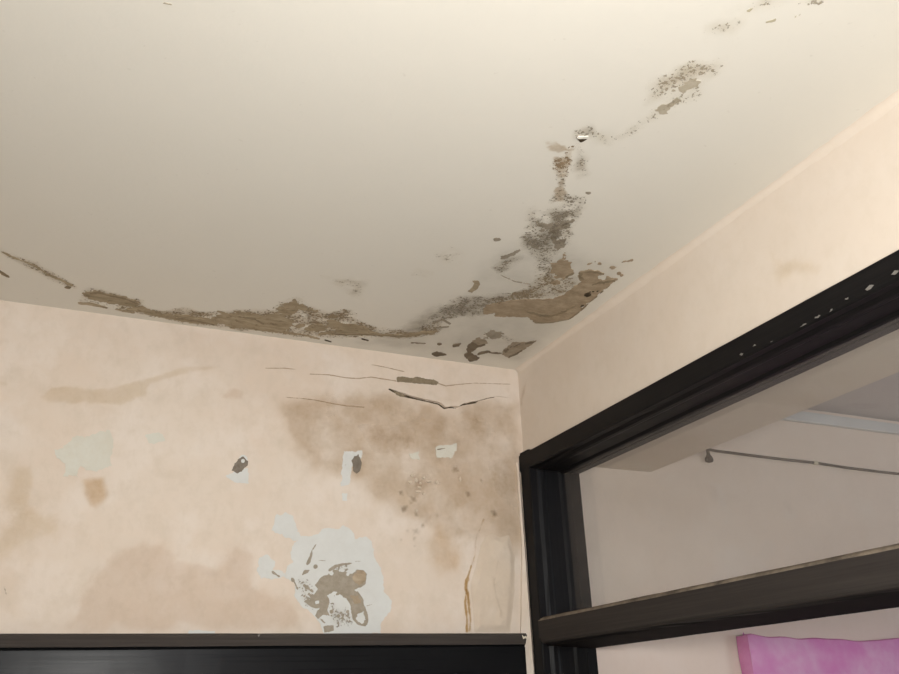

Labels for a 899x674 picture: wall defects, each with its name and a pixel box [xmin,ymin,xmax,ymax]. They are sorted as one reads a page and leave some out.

peeling [627,61,723,136]
crack [0,252,74,289]
peeling [483,209,633,324]
peeling [78,288,536,362]
crack [313,365,500,386]
crack [287,397,364,408]
flaking render [226,455,249,484]
flaking render [340,450,362,501]
peeling [435,443,457,458]
peeling [257,512,392,633]